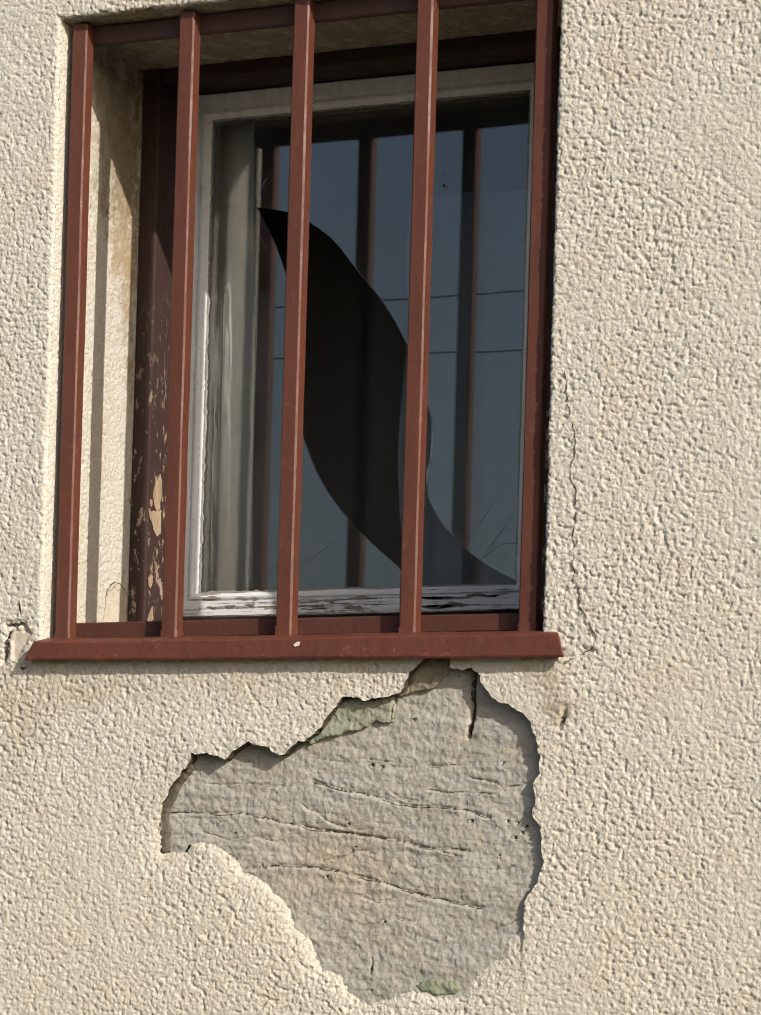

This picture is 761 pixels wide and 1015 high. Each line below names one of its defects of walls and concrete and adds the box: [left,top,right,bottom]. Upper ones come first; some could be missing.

spalling [9,626,34,662]
crack [562,371,596,665]
spalling [158,658,544,1005]